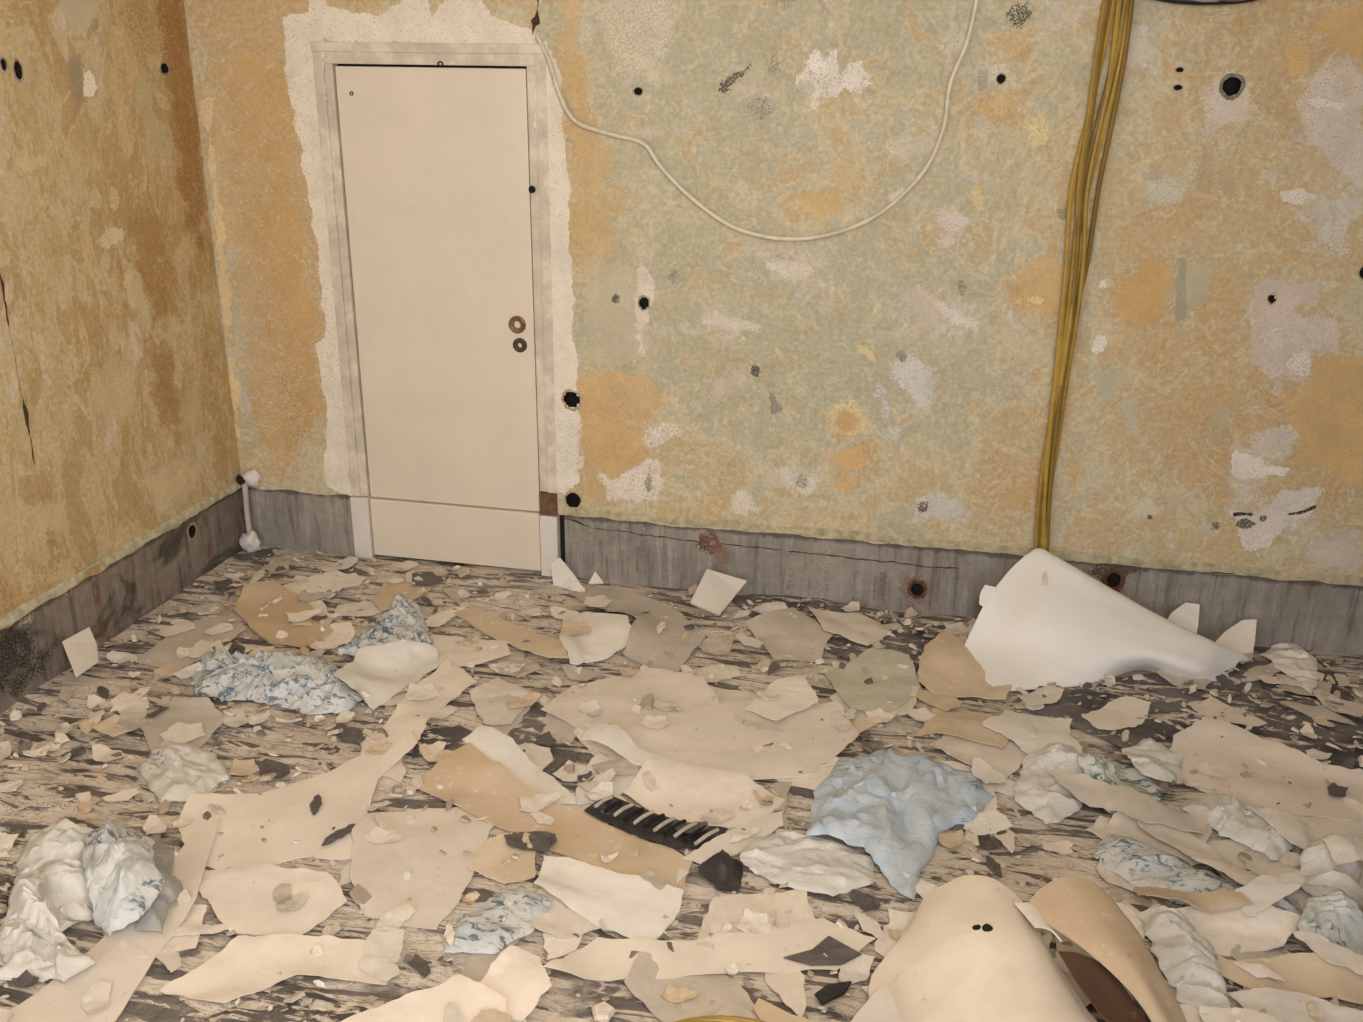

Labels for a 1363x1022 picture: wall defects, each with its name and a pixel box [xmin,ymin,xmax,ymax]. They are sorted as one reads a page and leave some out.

spalling [718,48,782,94]
peeling [795,49,873,113]
spalling [1294,56,1363,185]
spalling [1280,185,1363,280]
peeling [1249,274,1348,383]
peeling [1092,335,1147,441]
spalling [554,388,1363,590]
corrosion [691,529,731,569]
leakage [0,626,64,708]